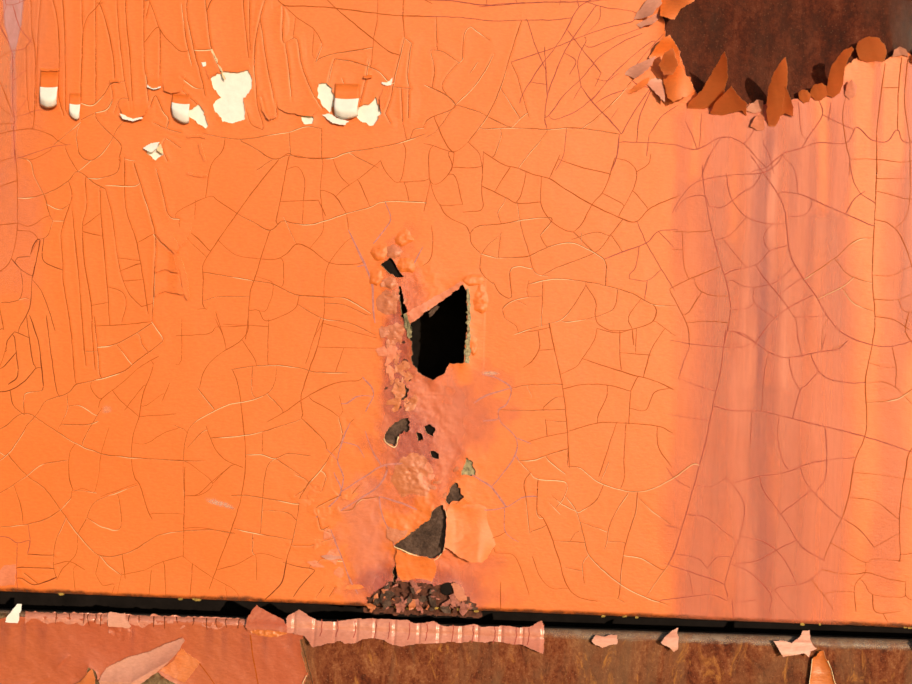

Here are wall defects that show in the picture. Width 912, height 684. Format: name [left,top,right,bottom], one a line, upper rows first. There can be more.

crack [143,0,226,161]
peeling [171,49,252,128]
crack [243,0,274,129]
crack [327,6,412,123]
crack [0,105,499,599]
rust [345,0,912,628]
peeling [386,451,496,595]
rust [0,588,336,605]
peeling [5,604,544,684]
rust [300,636,811,684]
peeling [774,623,821,657]
rust [826,648,912,684]